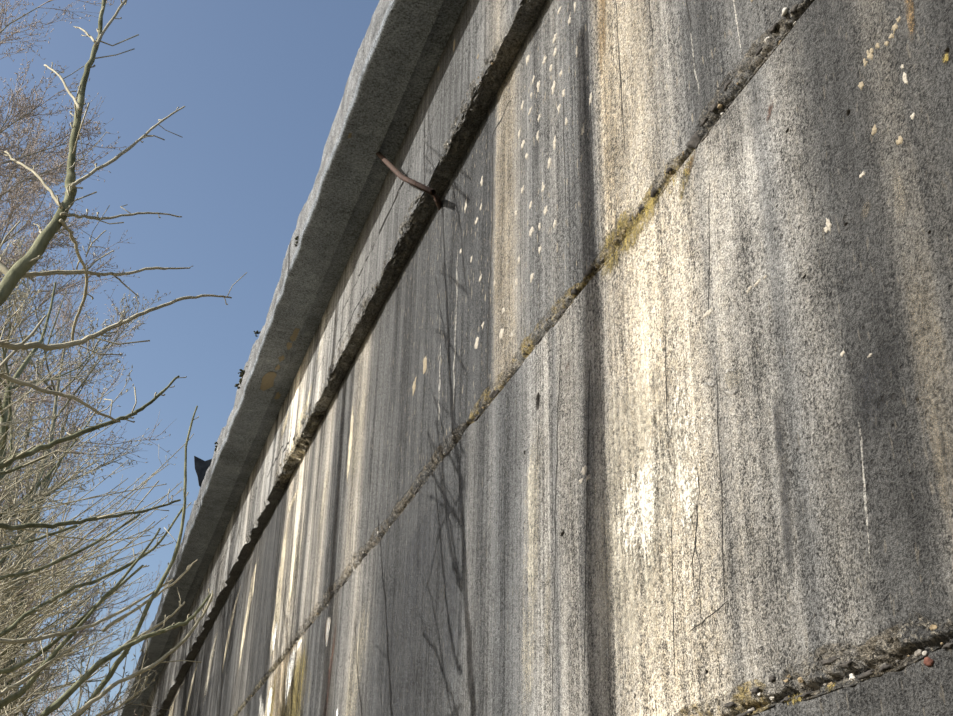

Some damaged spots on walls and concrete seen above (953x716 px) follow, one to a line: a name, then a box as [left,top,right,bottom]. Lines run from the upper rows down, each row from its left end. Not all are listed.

damp [281,385,312,462]
damp [347,396,365,480]
crack [665,347,728,676]
damp [169,566,256,716]
damp [259,638,306,716]
damp [270,527,304,658]
damp [336,617,368,716]